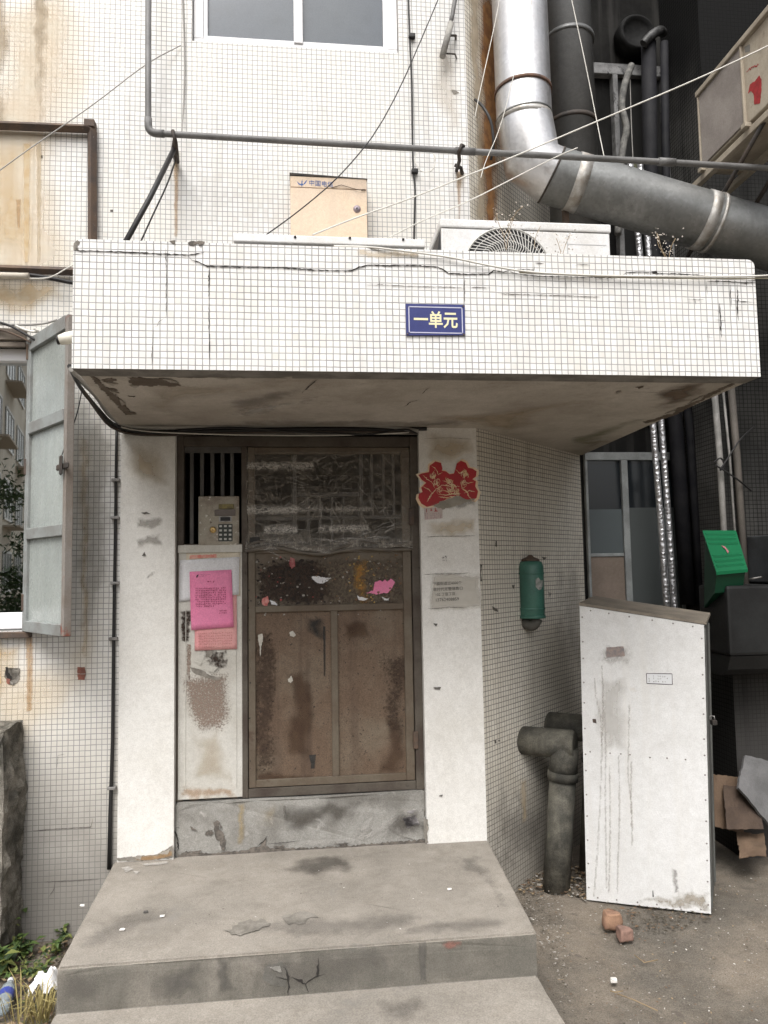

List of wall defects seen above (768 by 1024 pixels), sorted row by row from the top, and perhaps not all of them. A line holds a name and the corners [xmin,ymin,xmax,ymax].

water stain [36,0,45,36]
rust [471,0,497,221]
crack [75,250,759,358]
water stain [661,385,696,404]
peeling [4,668,20,686]
spalling [116,806,429,861]
spalling [225,911,317,936]
crack [278,958,326,992]